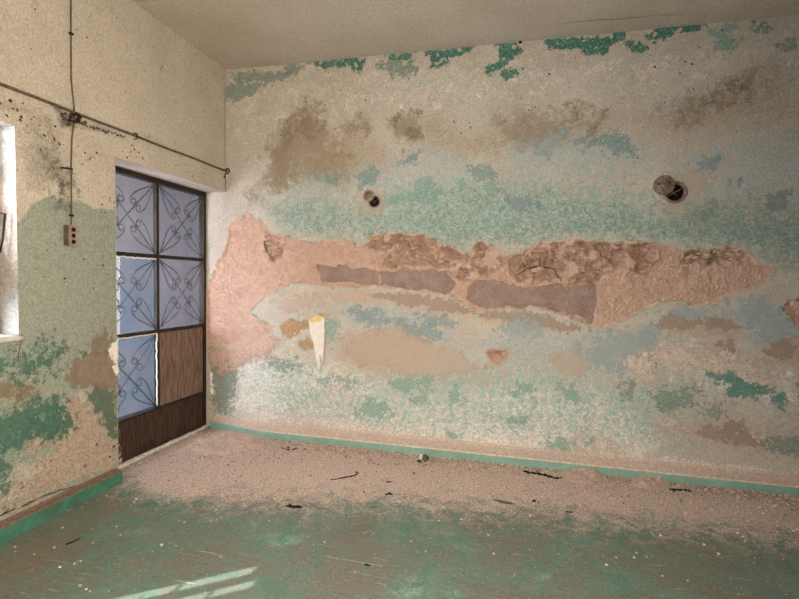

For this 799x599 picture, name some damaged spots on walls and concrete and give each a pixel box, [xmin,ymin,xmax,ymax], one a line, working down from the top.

flaking render [0,328,122,513]
flaking render [206,213,776,421]